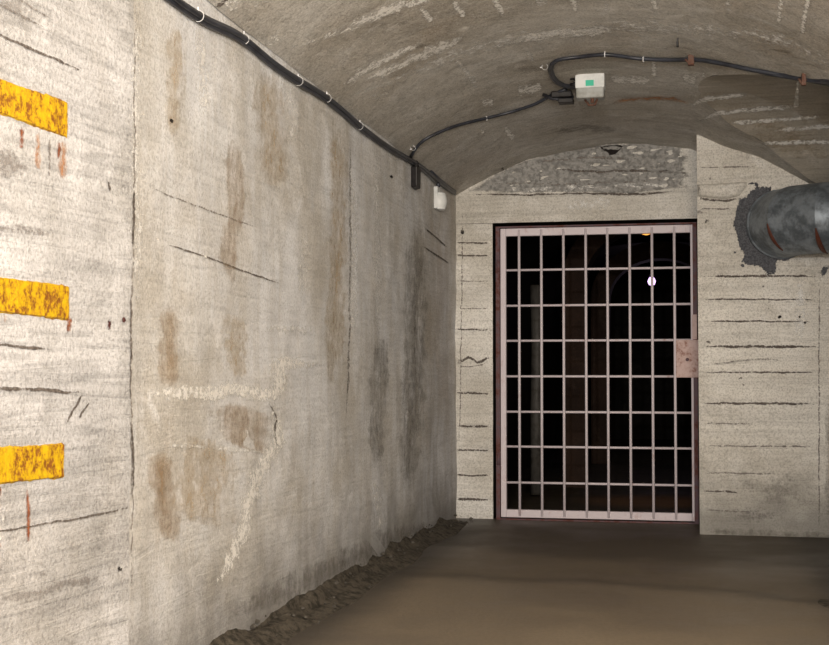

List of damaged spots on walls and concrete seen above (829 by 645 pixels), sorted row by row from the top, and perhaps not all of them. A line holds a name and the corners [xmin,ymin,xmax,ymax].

corrosion [36,138,65,175]
crack [0,11,278,580]